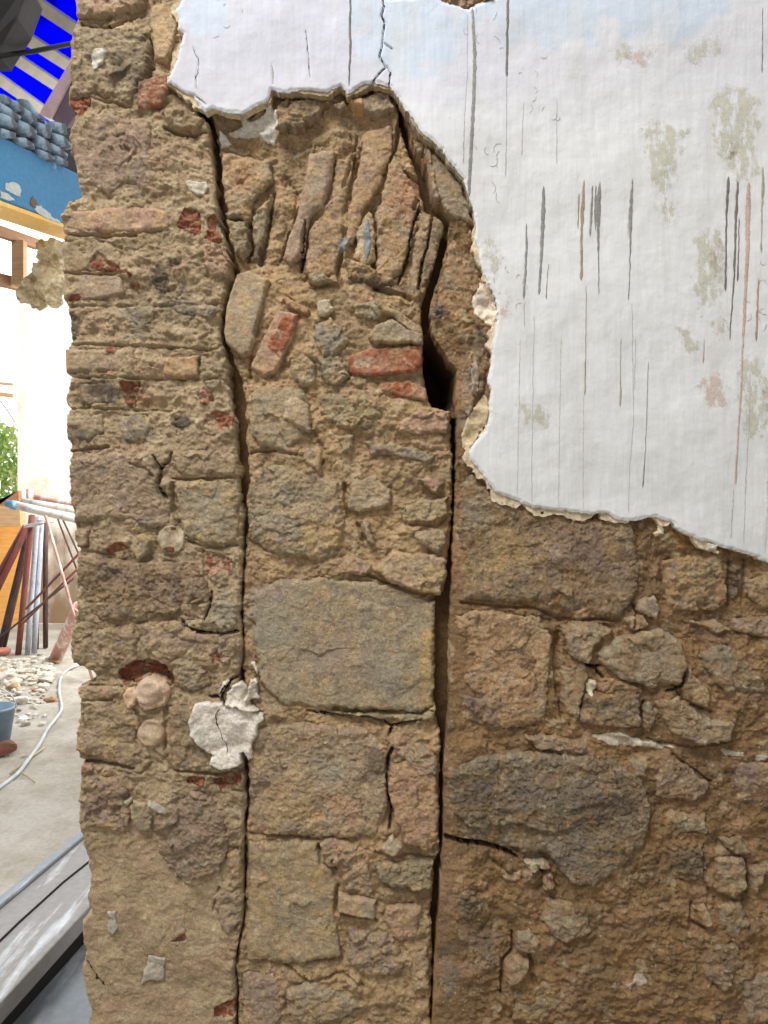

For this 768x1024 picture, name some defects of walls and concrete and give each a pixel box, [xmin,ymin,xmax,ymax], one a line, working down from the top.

flaking render [441,0,489,12]
spalling [177,207,226,244]
crack [193,48,241,277]
crack [398,113,448,336]
water stain [619,179,649,511]
water stain [645,125,688,190]
water stain [694,88,768,544]
crack [181,337,251,636]
spalling [118,659,175,684]
crack [212,664,250,950]
peeling [218,661,260,712]
crack [309,419,513,1021]